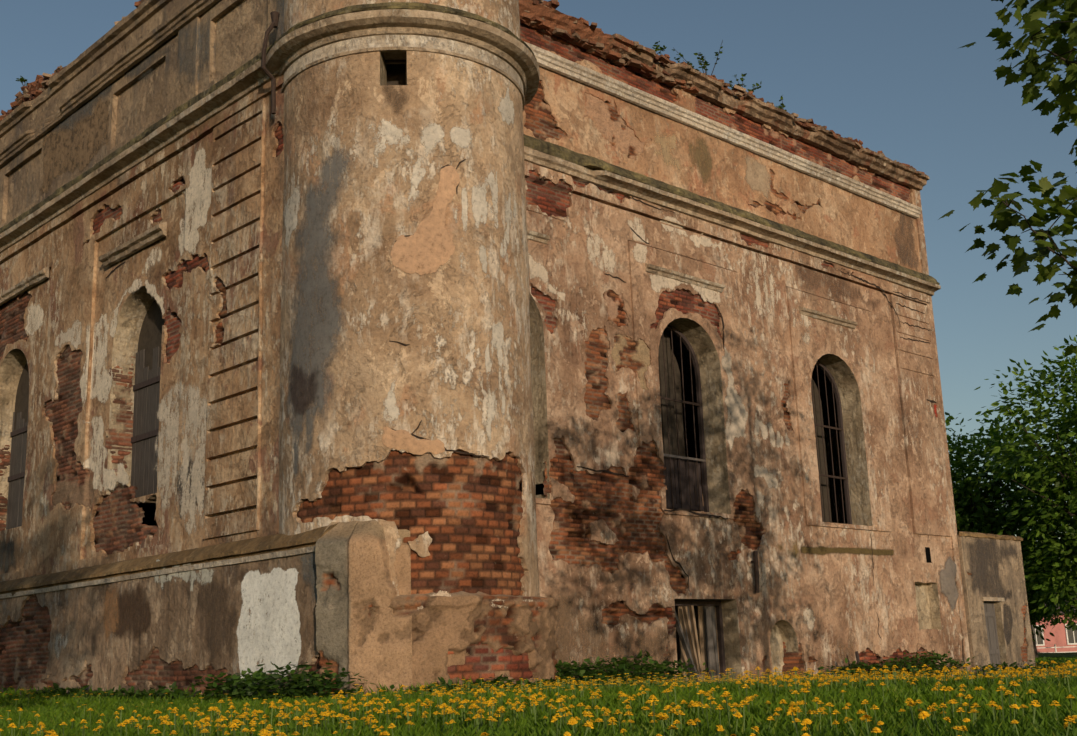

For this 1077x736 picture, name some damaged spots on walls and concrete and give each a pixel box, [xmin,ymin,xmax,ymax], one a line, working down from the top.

spalling [520,0,925,203]
spalling [525,170,629,217]
peeling [660,216,722,251]
spalling [0,292,44,360]
spalling [40,148,231,555]
leakage [284,143,347,474]
spalling [584,290,651,432]
spalling [650,274,792,450]
spalling [297,450,525,596]
spalling [543,437,687,596]
spalling [727,464,779,561]
spalling [601,601,676,664]